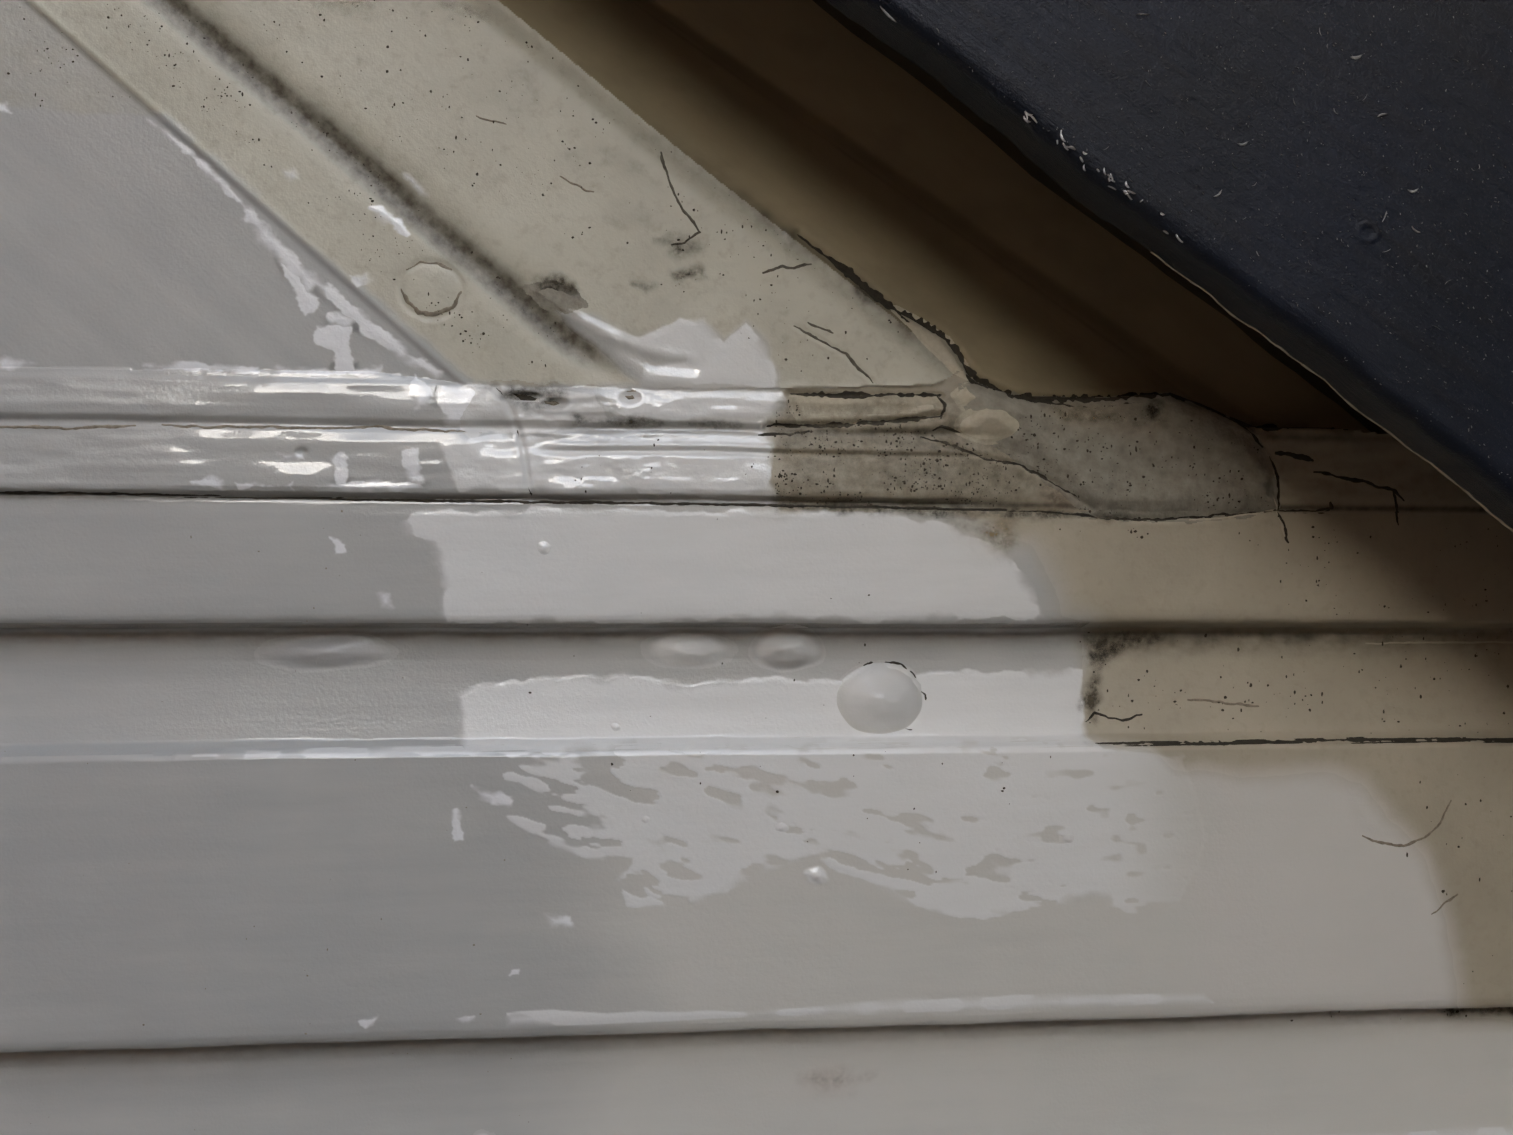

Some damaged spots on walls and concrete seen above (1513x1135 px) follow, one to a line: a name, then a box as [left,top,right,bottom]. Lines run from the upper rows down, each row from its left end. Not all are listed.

crack [660,152,701,246]
crack [0,234,1405,543]
water stain [768,400,1262,539]